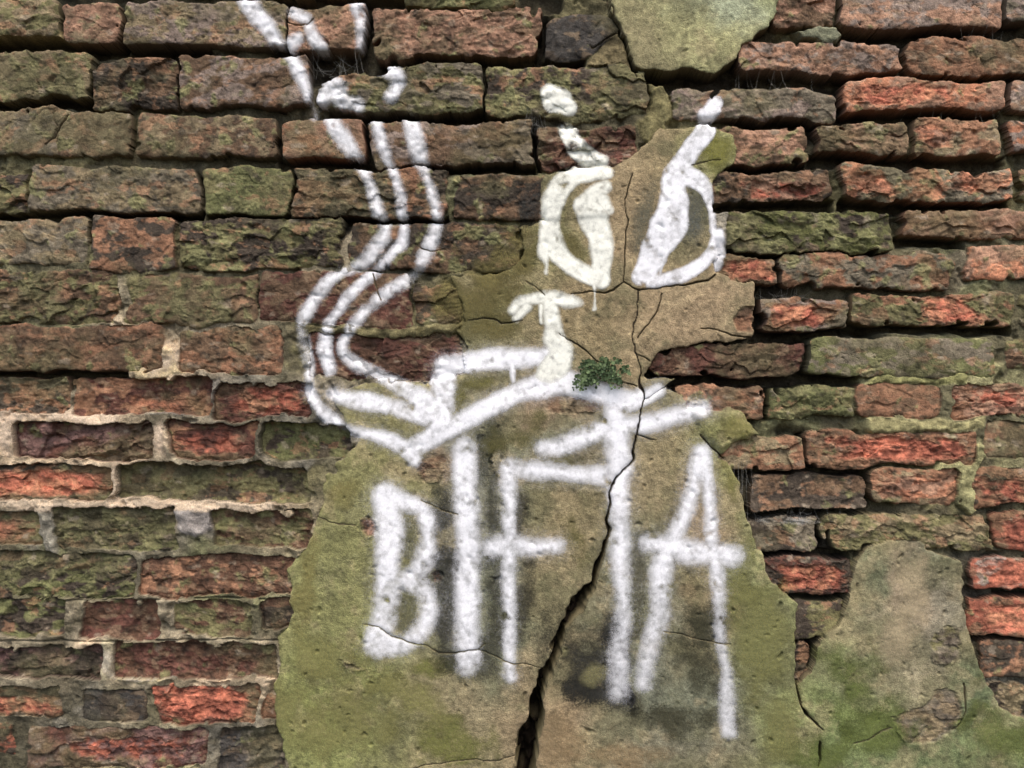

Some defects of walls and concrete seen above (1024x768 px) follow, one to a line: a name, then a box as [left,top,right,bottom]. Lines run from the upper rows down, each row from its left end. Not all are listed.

crack [705,328,750,340]
spalling [732,305,754,334]
spalling [916,296,985,330]
spalling [172,386,312,457]
crack [700,435,724,459]
spalling [0,468,114,500]
crack [365,173,716,768]
spalling [824,433,969,502]
spalling [974,518,1024,590]
spalling [777,559,851,594]
spalling [978,601,1024,636]
crack [664,631,731,645]